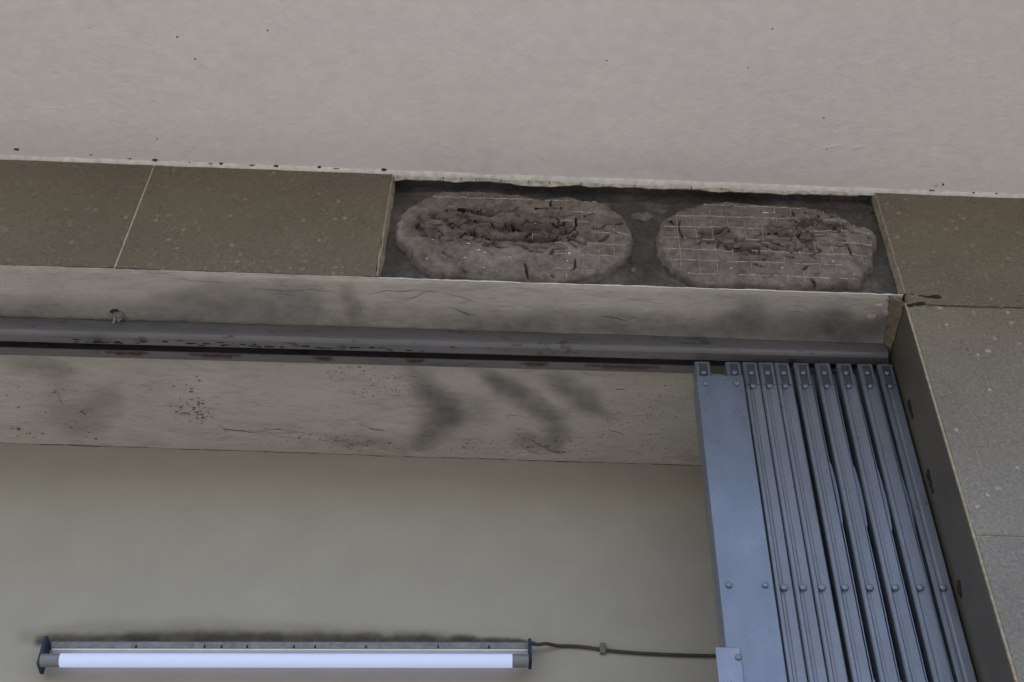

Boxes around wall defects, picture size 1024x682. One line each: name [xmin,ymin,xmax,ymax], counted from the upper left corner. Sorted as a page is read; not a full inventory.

peeling [376,168,905,349]